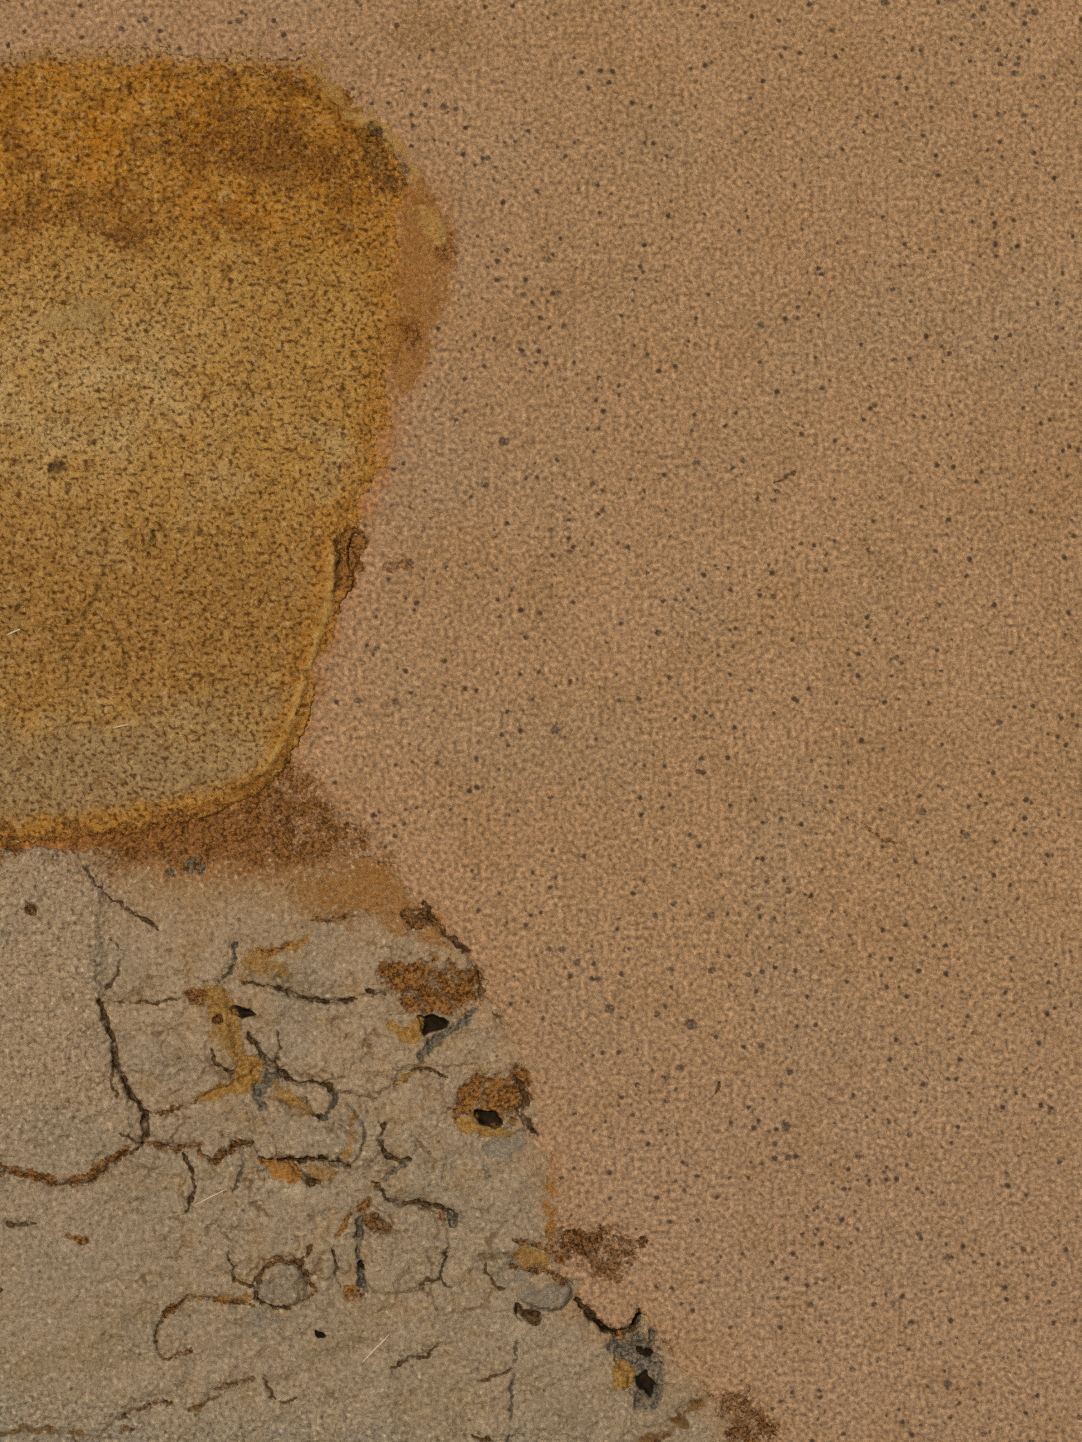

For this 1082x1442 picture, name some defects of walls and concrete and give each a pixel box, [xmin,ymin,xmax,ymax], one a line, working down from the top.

flaking render [358,121,459,391]
spalling [334,526,369,592]
peeling [183,985,245,1062]
spalling [377,951,484,1062]
crack [421,901,505,1026]
crack [0,866,458,1361]
spalling [447,1064,538,1159]
crack [484,1263,505,1291]
crack [263,1377,297,1404]
crack [390,1346,437,1369]
crack [471,1341,518,1442]
spalling [494,1280,666,1409]